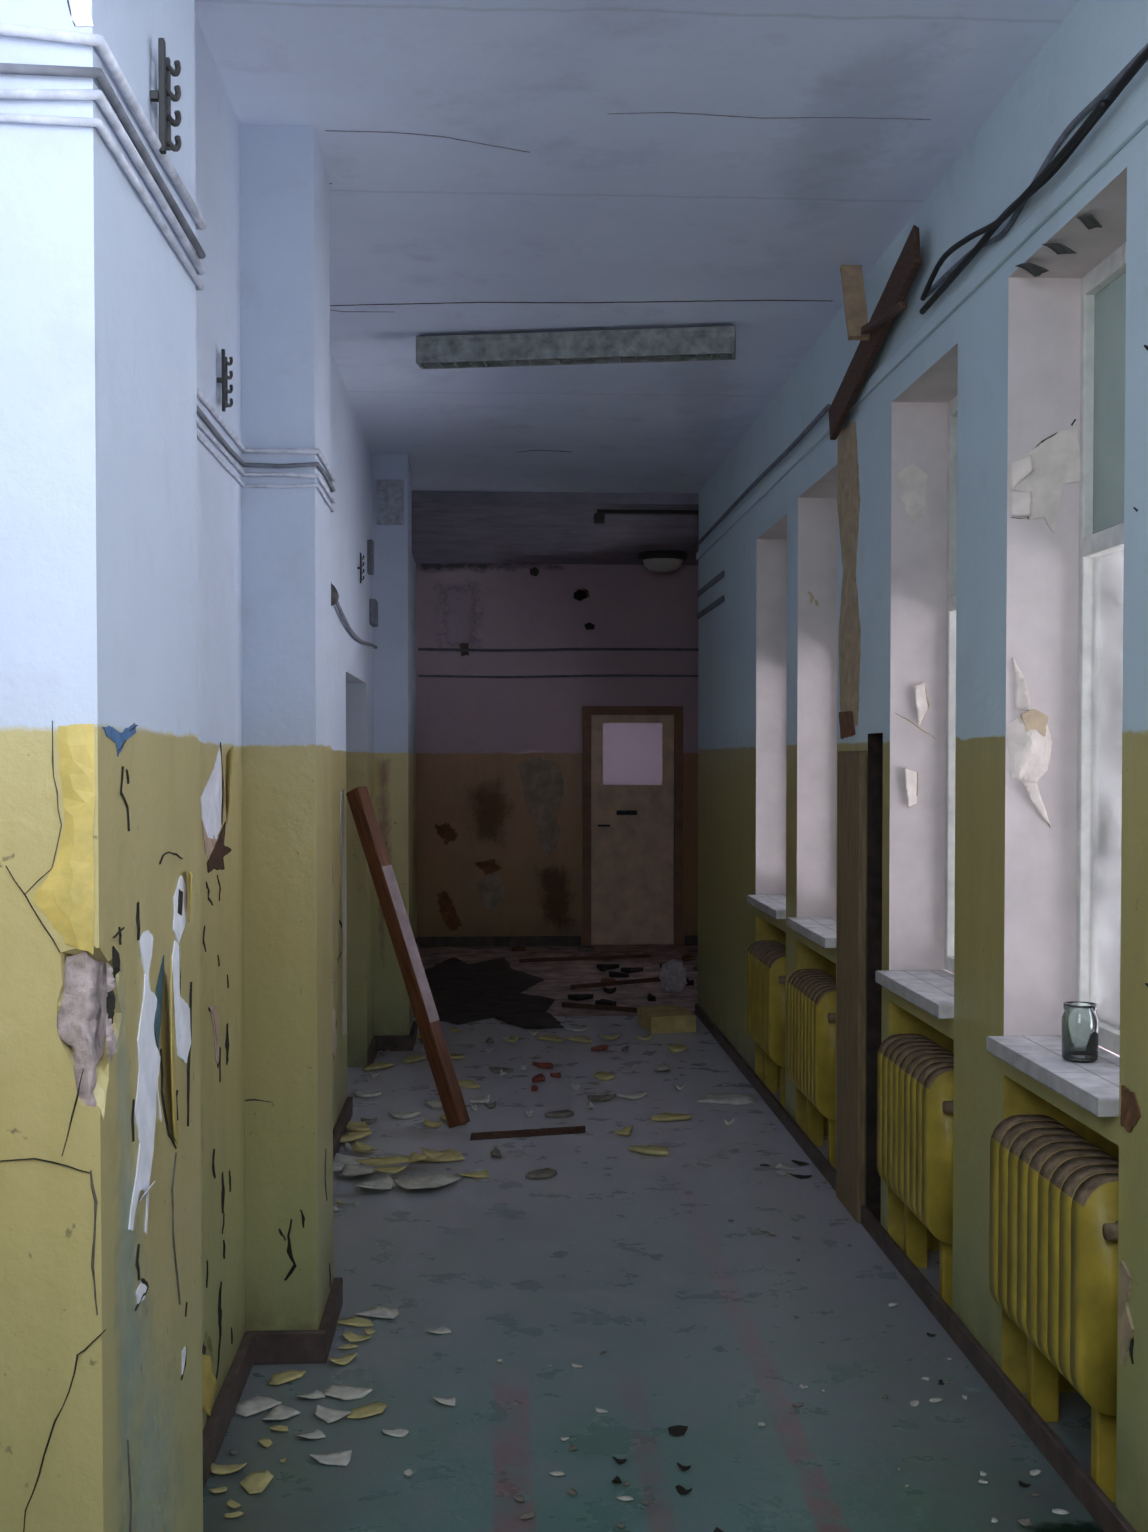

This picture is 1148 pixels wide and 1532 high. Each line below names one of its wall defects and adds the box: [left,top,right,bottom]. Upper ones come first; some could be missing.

crack [6,721,95,955]
peeling [102,723,138,831]
spalling [57,742,234,1312]
peeling [337,790,346,1034]
peeling [904,768,918,807]
peeling [896,681,936,739]